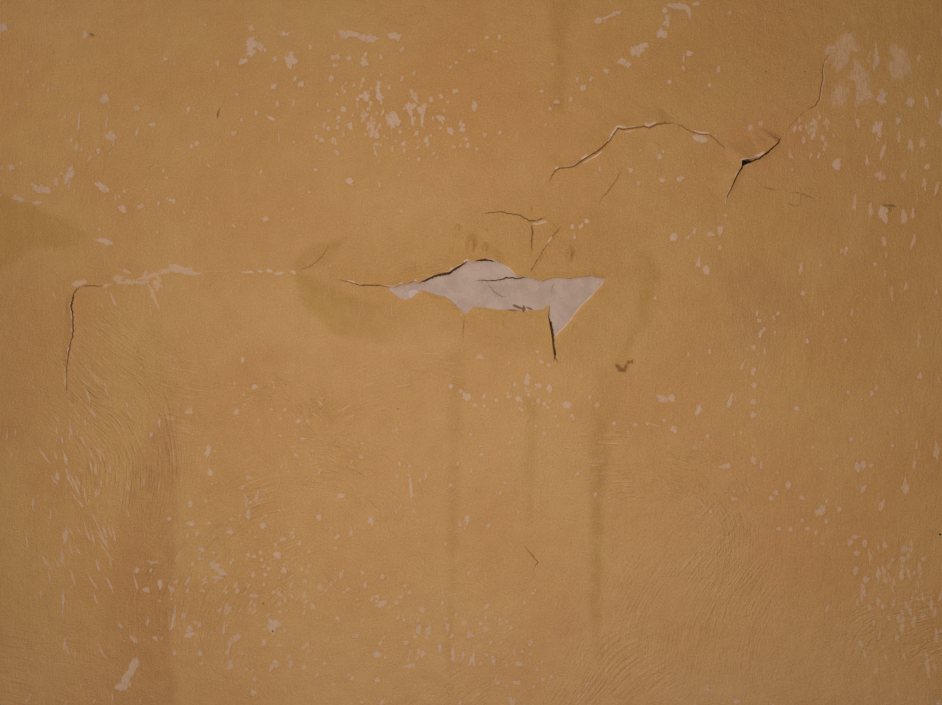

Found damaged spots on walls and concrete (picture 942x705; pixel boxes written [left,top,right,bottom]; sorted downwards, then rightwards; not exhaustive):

crack [544,47,831,203]
crack [484,207,560,272]
crack [61,245,329,395]
peeling [337,246,607,368]
peeling [448,371,577,437]